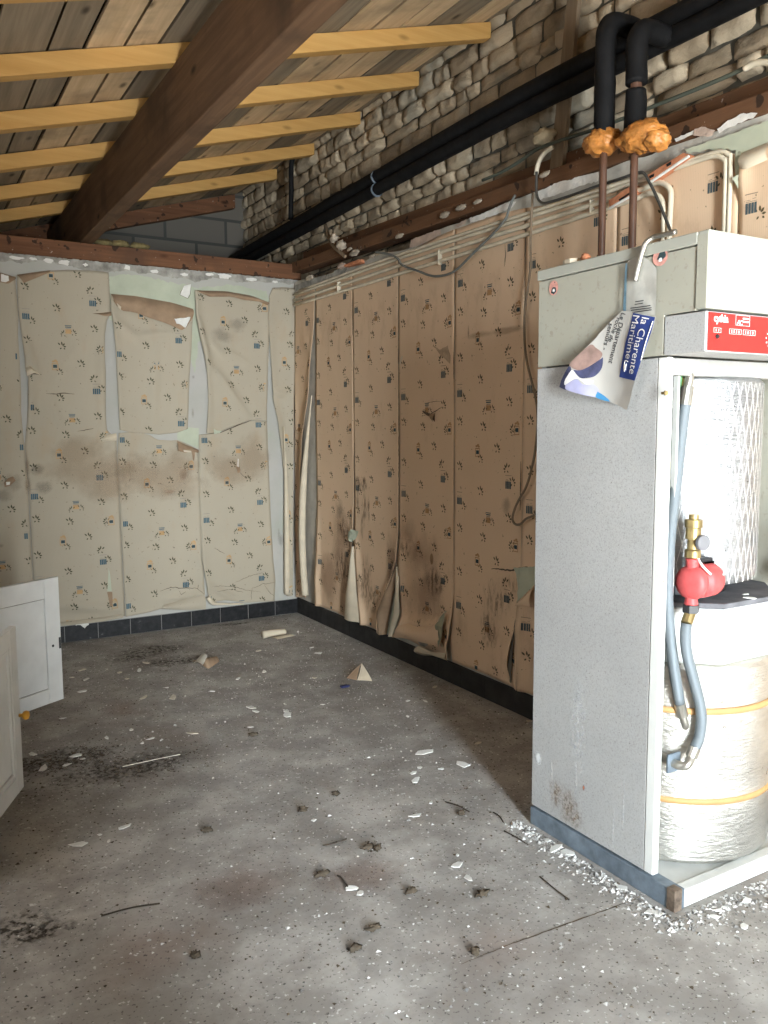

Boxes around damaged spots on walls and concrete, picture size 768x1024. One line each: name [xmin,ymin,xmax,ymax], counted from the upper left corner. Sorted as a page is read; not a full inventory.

flaking render [410,230,441,247]
flaking render [0,252,347,372]
flaking render [177,427,199,448]
flaking render [514,566,535,601]